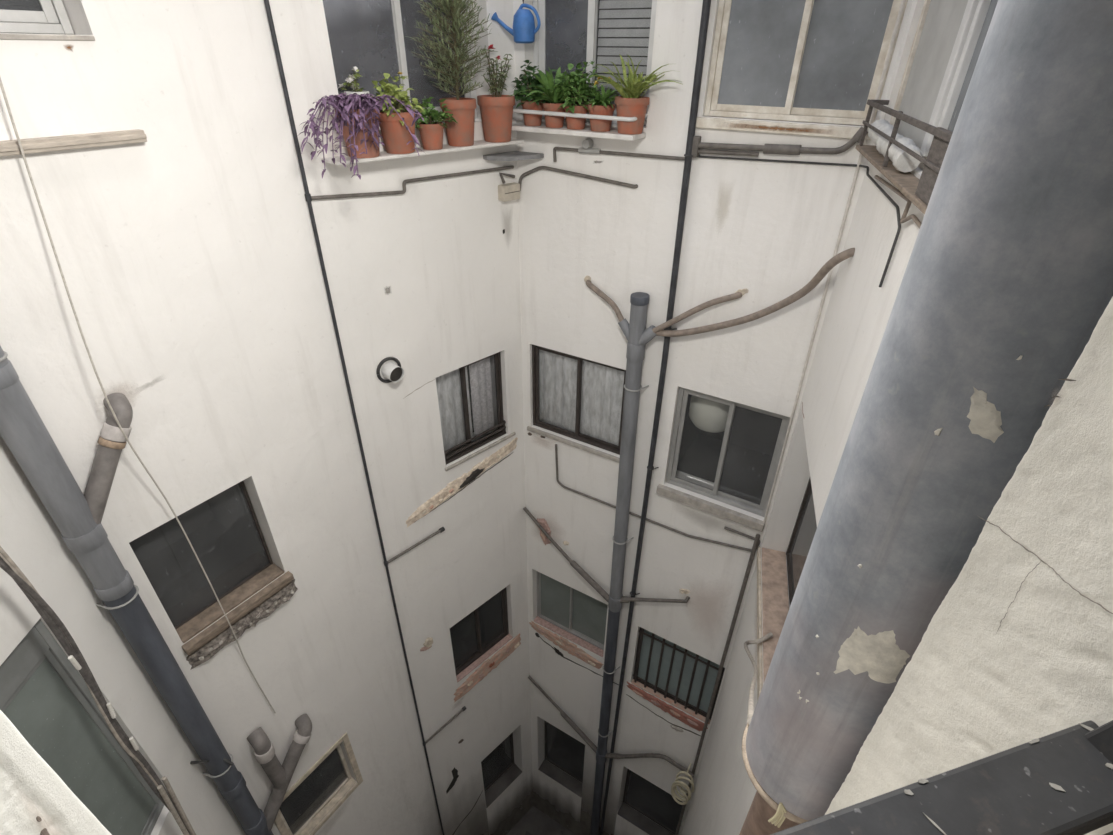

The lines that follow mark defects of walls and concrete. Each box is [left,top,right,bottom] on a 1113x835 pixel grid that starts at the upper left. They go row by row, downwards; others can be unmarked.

crack [980,517,1113,634]